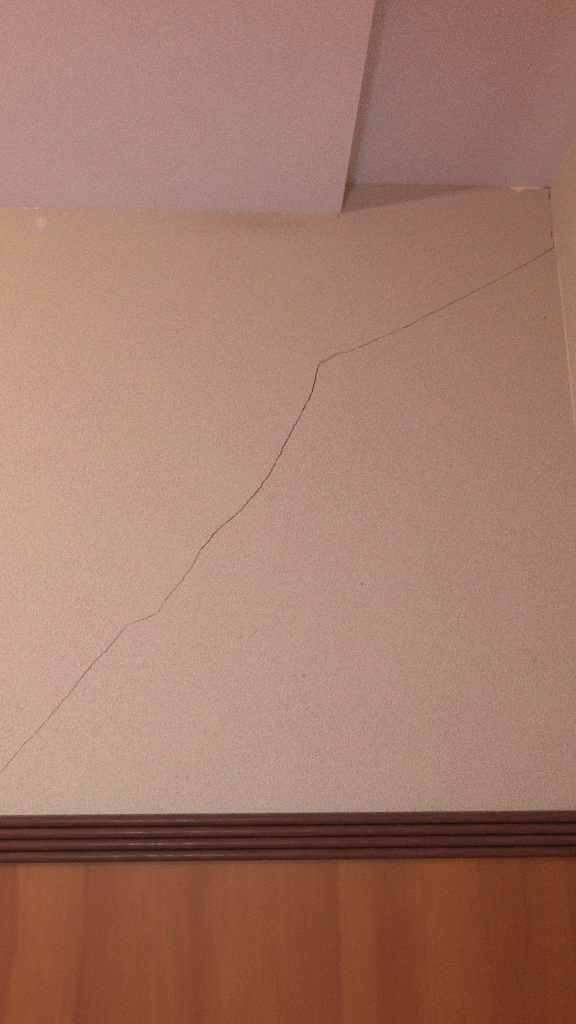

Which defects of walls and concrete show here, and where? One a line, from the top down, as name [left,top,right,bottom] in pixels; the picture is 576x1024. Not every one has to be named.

crack [0,230,554,772]